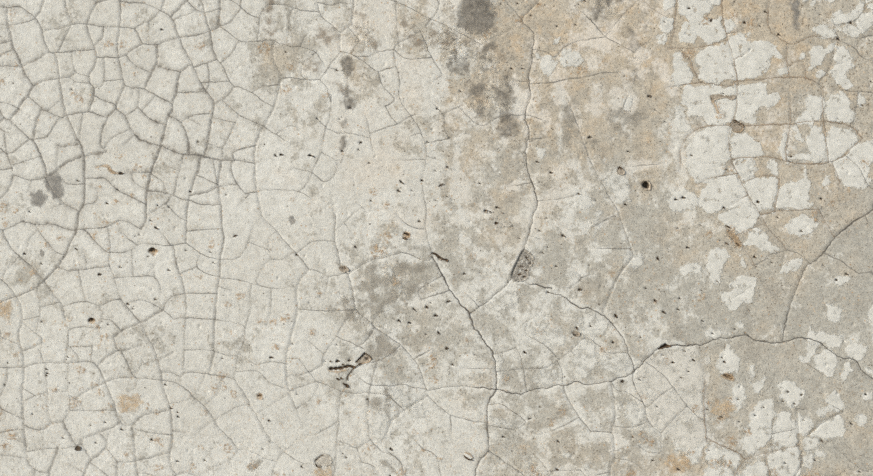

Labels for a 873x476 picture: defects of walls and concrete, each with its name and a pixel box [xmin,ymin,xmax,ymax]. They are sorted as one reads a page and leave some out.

leakage [458,0,496,32]
peeling [534,37,584,76]
peeling [656,0,873,311]
peeling [603,176,651,204]
crack [667,0,873,379]
spalling [492,249,534,311]
crack [274,104,798,476]
peeling [826,302,842,323]
peeling [528,314,628,378]
crack [81,368,213,475]
peeling [625,326,873,476]